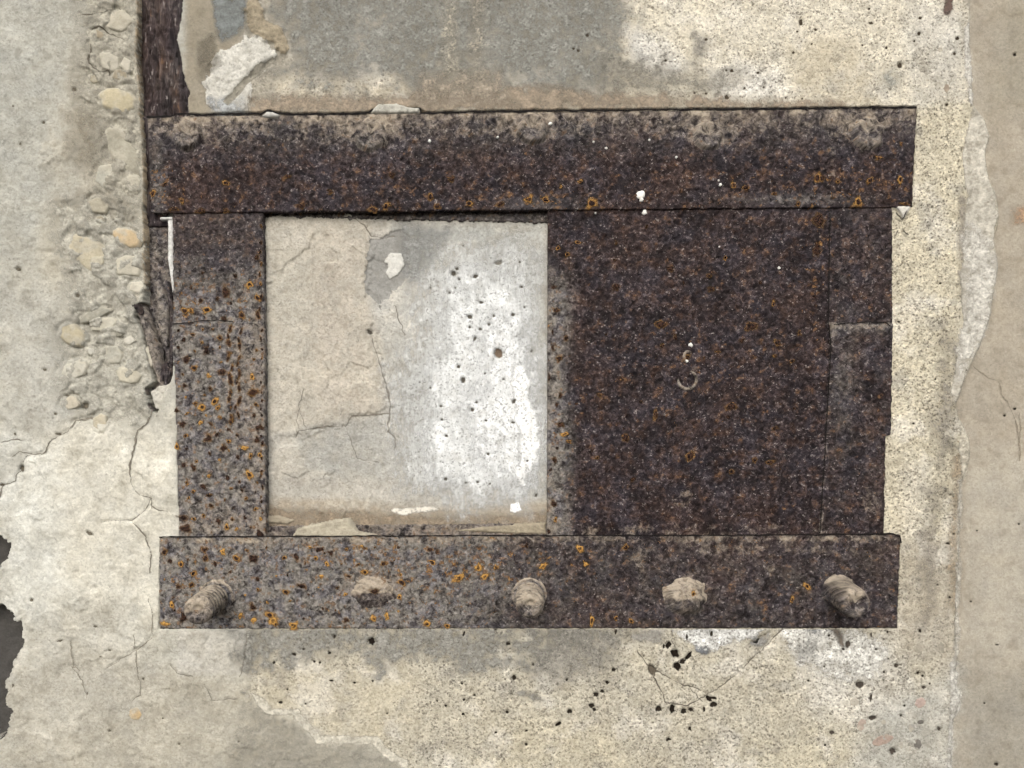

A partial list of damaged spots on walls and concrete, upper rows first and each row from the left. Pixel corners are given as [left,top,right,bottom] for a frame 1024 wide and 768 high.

crack [0,417,94,496]
rust [160,241,557,630]
crack [115,213,902,572]
rust [549,422,572,471]
spalling [0,535,11,565]
spalling [0,604,25,739]
crack [70,641,87,698]
crack [107,598,153,700]